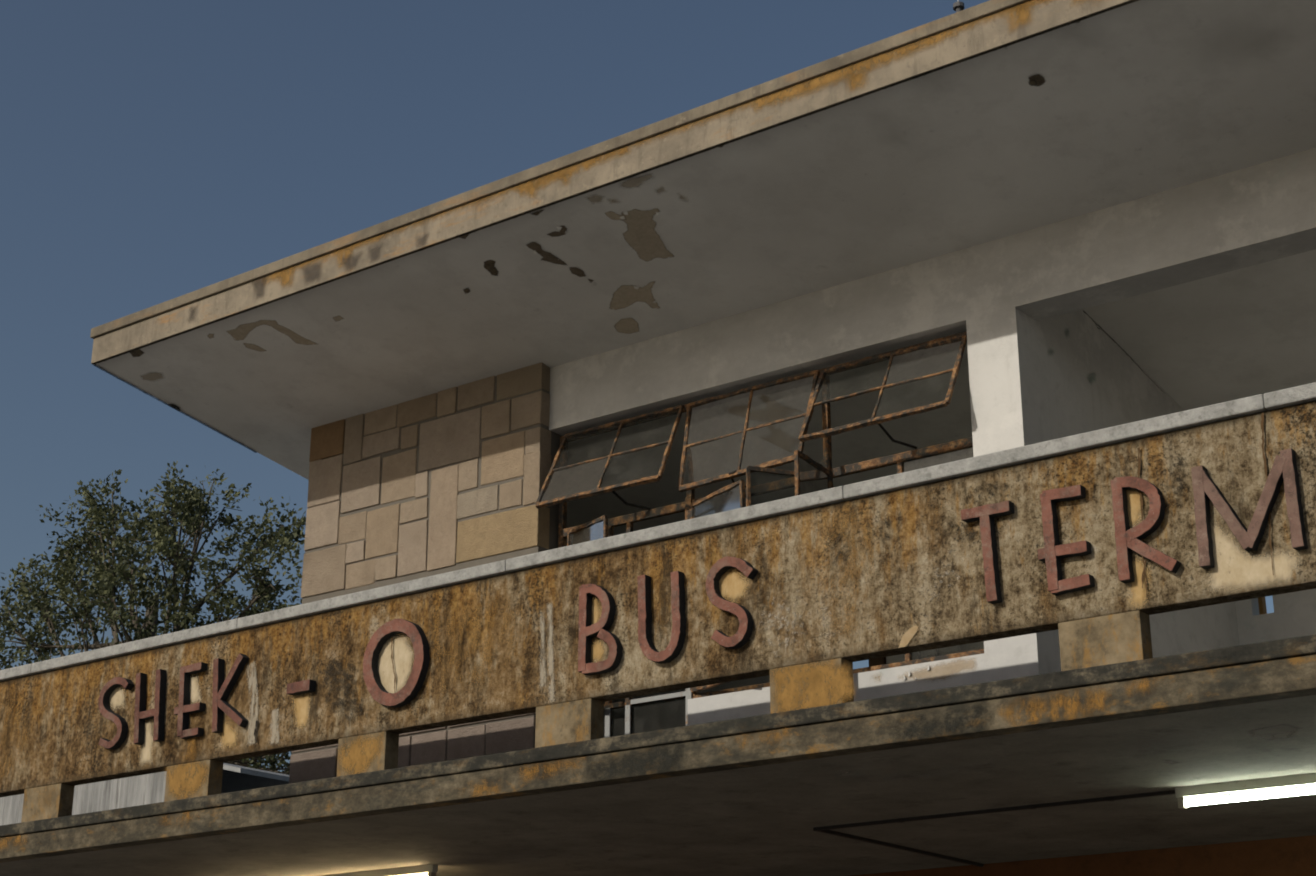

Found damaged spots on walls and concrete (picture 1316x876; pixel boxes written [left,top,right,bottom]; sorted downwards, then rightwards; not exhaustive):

corrosion [397,0,1041,231]
peeling [588,175,674,261]
corrosion [262,235,381,285]
peeling [527,226,593,283]
peeling [208,320,316,351]
peeling [609,281,660,334]
leakage [1131,561,1148,606]
efflorescence [540,604,554,701]
leakage [247,662,279,744]
leakage [311,656,368,726]